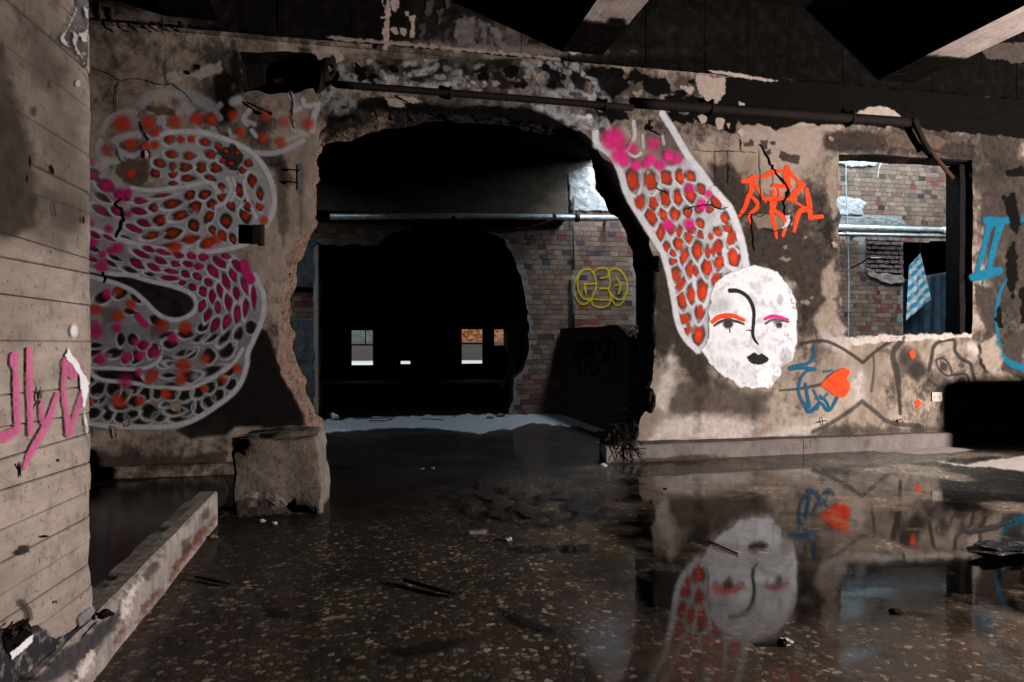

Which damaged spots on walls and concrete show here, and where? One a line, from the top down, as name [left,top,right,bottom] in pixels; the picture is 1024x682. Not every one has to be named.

crack [90,61,191,111]
spalling [276,0,657,440]
crack [656,139,793,251]
flaking render [680,70,906,285]
flaking render [884,132,950,151]
spalling [814,260,971,346]
water stain [649,270,767,441]
water stain [852,372,863,399]
water stain [768,419,950,436]